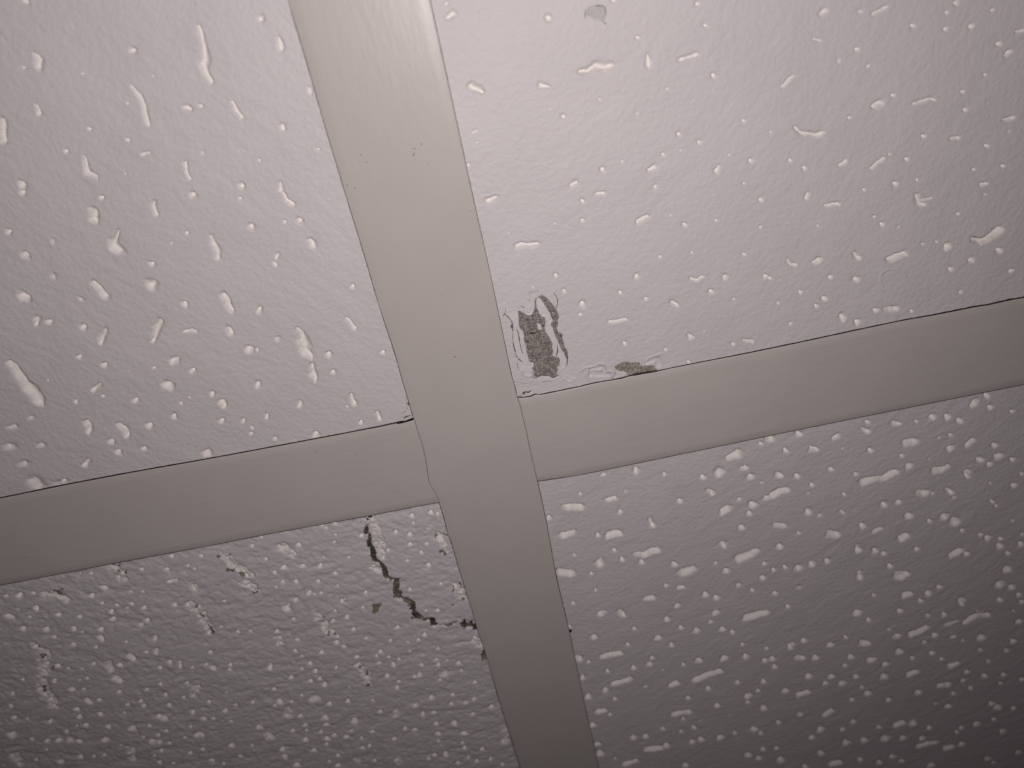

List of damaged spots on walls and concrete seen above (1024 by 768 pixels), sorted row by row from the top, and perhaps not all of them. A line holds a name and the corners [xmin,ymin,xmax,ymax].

crack [0,5,520,767]
peeling [503,289,576,395]
spalling [612,362,657,379]